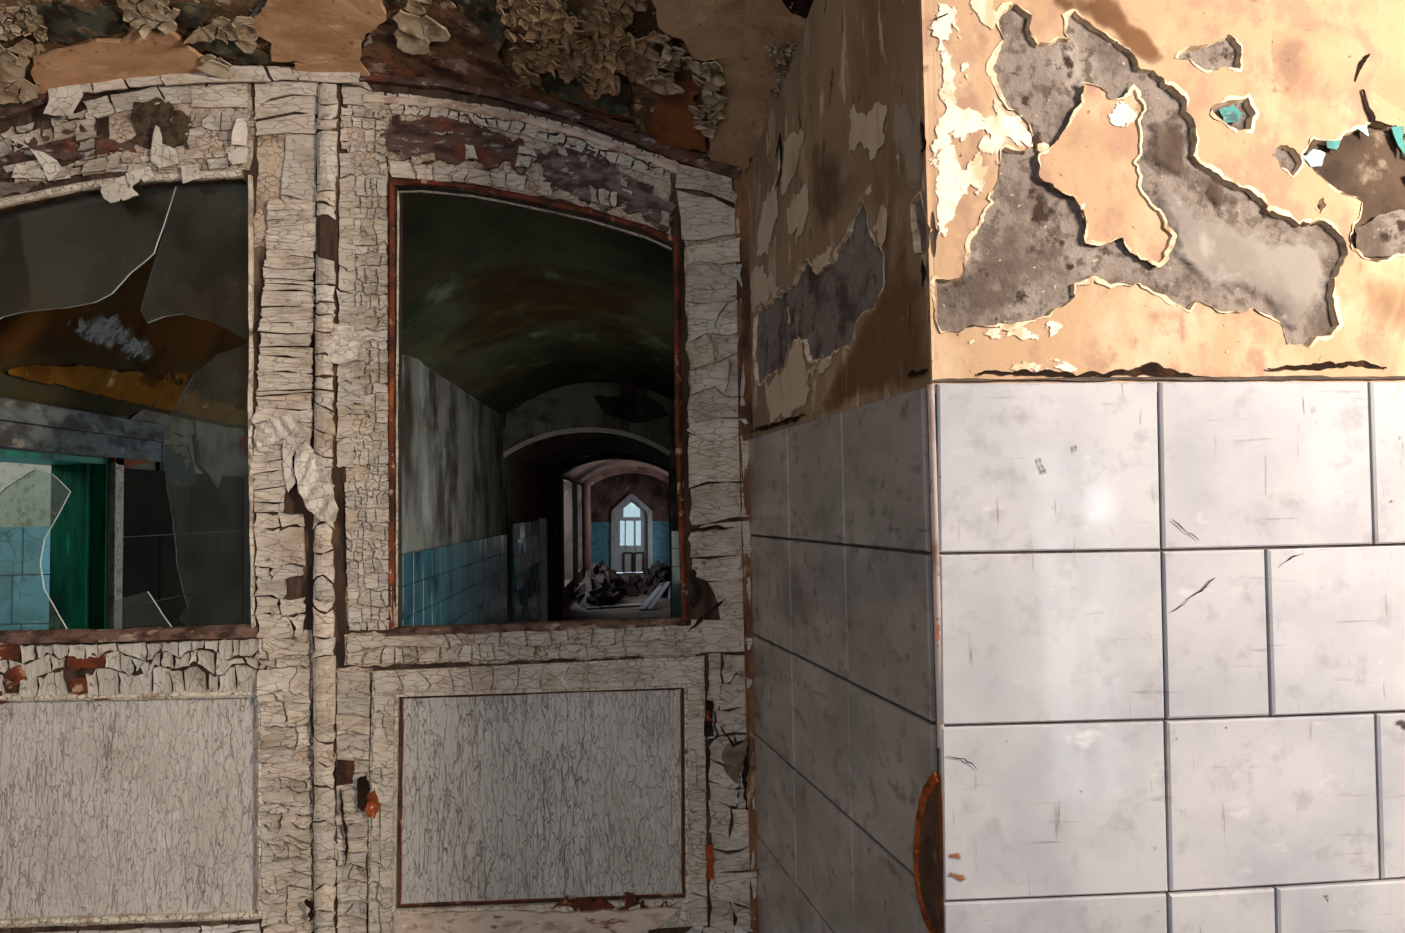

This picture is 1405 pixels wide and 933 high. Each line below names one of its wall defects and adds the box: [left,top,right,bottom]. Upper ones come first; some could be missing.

peeling [0,0,269,203]
peeling [379,113,676,233]
peeling [360,0,728,154]
peeling [848,101,899,161]
spalling [910,0,1405,348]
spalling [750,129,887,423]
water stain [827,258,917,406]
crack [978,362,1229,382]
crack [1267,360,1387,371]
rust [335,760,380,819]
crack [304,899,315,922]